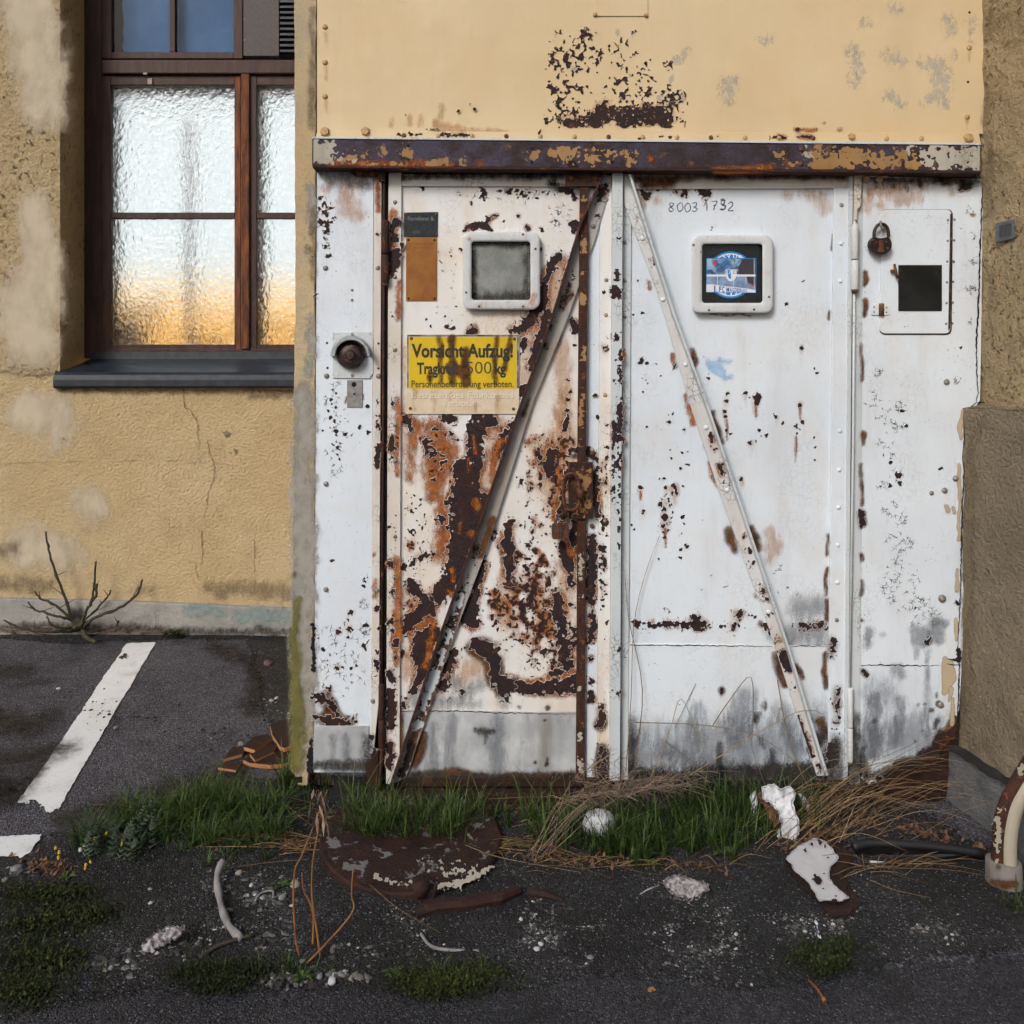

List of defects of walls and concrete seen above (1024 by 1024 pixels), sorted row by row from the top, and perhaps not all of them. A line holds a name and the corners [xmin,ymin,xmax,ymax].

peeling [522,26,688,168]
corrosion [374,179,398,251]
corrosion [329,159,454,169]
corrosion [714,164,772,174]
corrosion [684,394,696,426]
crack [165,391,215,577]
corrosion [518,433,604,559]
corrosion [391,397,566,777]
damp [598,409,979,793]
damp [0,583,372,774]
damp [405,758,576,778]